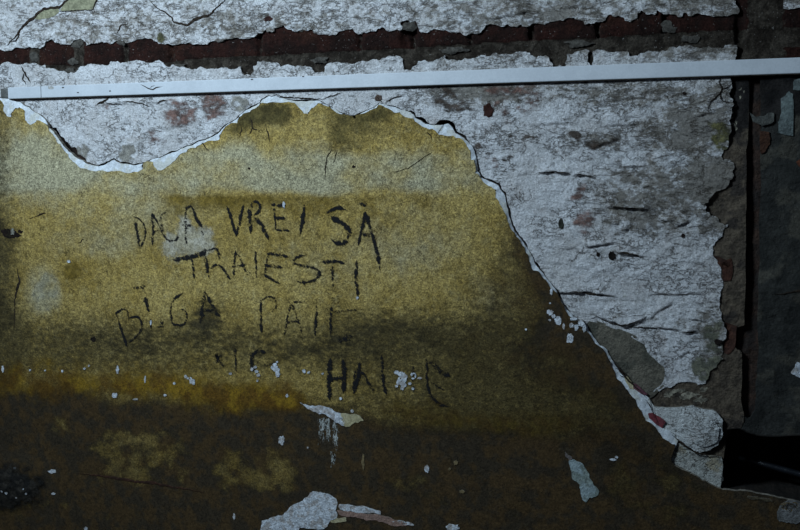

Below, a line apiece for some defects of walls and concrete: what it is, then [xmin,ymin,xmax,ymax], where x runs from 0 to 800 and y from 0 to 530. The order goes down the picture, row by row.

crack [8,0,98,45]
spalling [0,0,800,75]
damp [230,96,290,129]
damp [331,108,387,143]
flaking render [748,79,800,136]
damp [118,144,135,163]
damp [168,194,283,211]
flaking render [0,51,748,487]
damp [0,234,800,530]
peeling [565,452,599,502]
peeling [260,491,414,530]